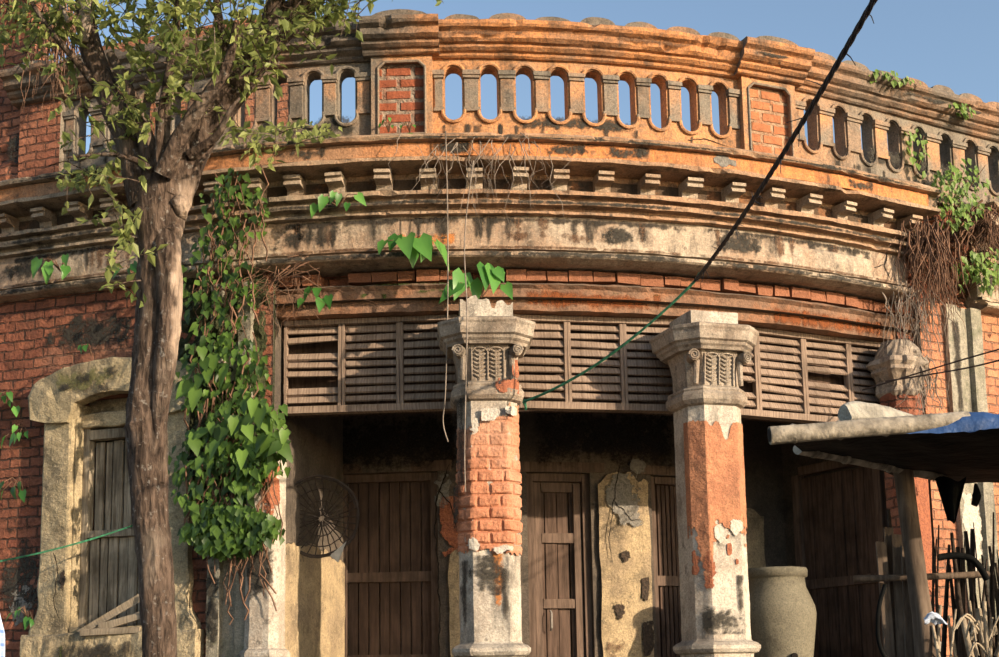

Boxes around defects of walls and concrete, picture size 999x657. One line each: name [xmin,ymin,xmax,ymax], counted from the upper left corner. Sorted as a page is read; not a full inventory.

leakage [325,199,461,207]
leakage [481,199,676,210]
leakage [267,217,458,263]
leakage [473,217,685,262]
leakage [45,311,132,351]
spalling [434,360,523,557]
crack [608,467,644,559]
flaking render [683,420,747,589]
leakage [460,555,508,622]
leakage [702,575,743,634]
leakage [57,641,130,657]